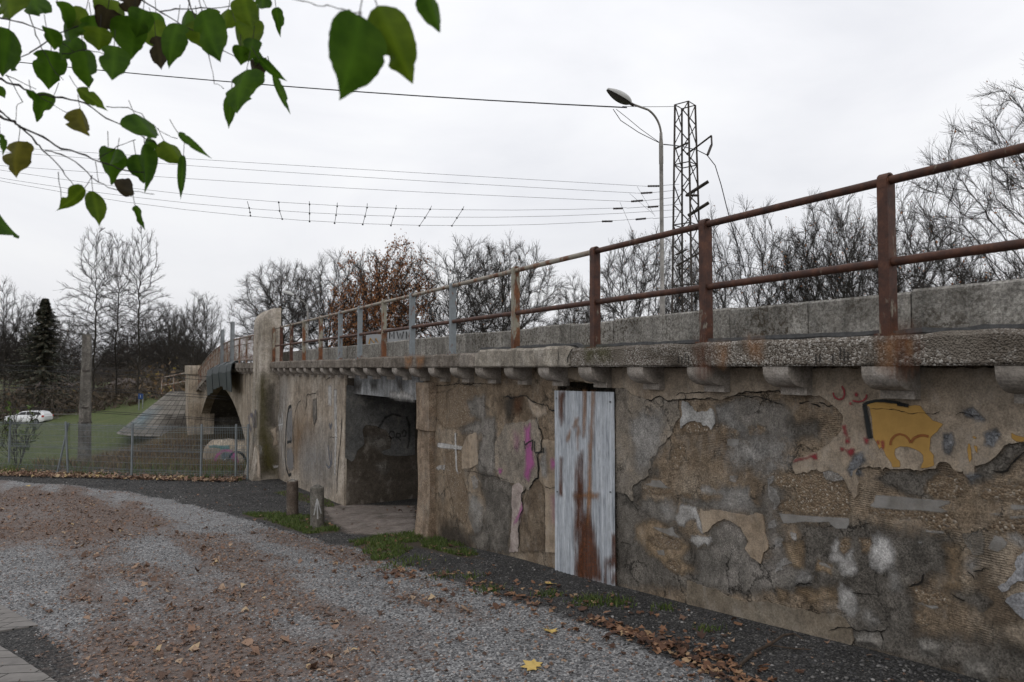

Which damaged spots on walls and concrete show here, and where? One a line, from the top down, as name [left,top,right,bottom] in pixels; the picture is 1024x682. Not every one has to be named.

flaking render [680,401,716,434]
crack [646,390,832,407]
spalling [436,432,478,524]
crack [436,383,555,548]
flaking render [494,399,555,553]
rust [559,393,616,583]
spalling [768,471,851,526]
spalling [868,442,1024,531]
spalling [636,520,692,576]
flaking render [998,552,1024,619]